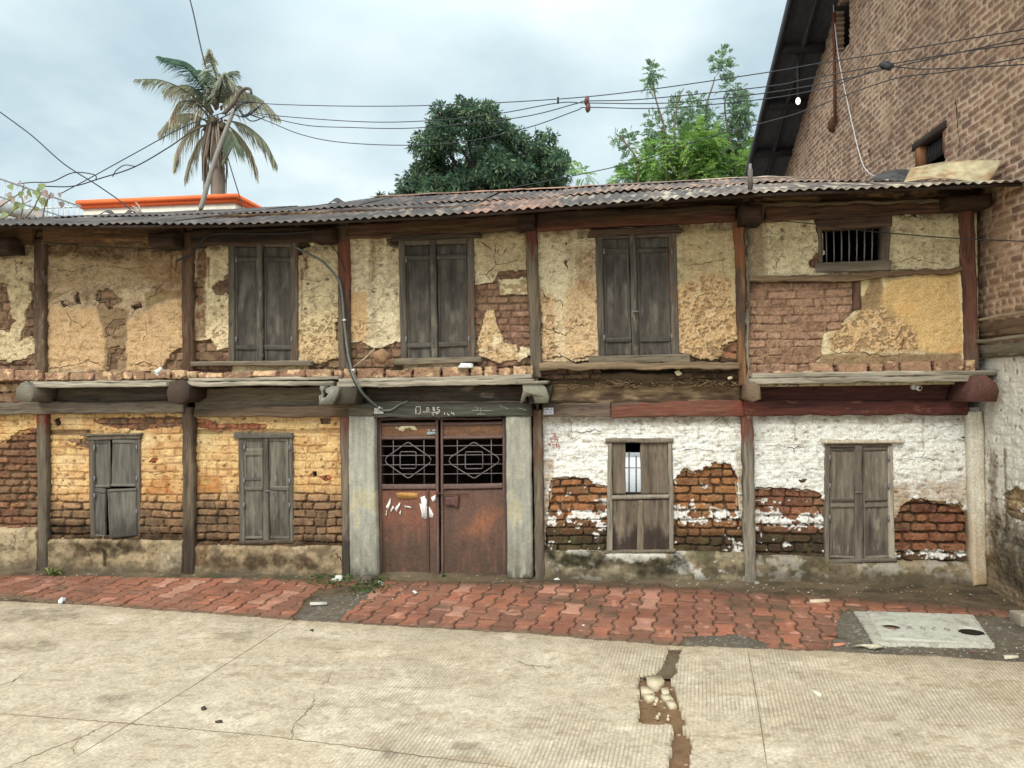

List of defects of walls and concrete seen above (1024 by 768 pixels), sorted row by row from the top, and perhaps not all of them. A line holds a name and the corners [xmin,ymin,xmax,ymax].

flaking render [0,283,34,341]
flaking render [61,287,142,371]
flaking render [472,268,601,381]
flaking render [675,282,853,386]
flaking render [94,415,182,433]
flaking render [0,429,38,528]
water stain [50,523,181,565]
water stain [197,537,342,569]
flaking render [545,476,607,551]
flaking render [673,459,743,552]
flaking render [755,479,825,556]
flaking render [889,495,967,562]